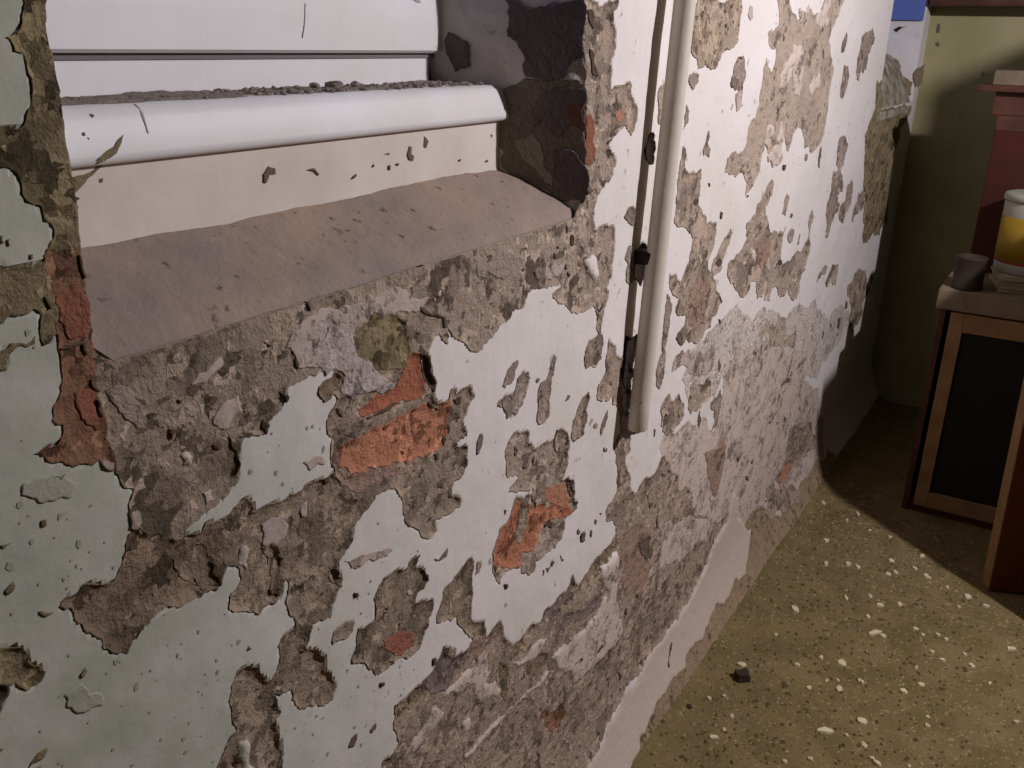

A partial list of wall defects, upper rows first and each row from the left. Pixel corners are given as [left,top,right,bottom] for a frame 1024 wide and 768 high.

spalling [688,0,753,111]
spalling [840,28,875,99]
spalling [654,80,908,437]
spalling [0,0,729,768]
spalling [769,416,817,488]